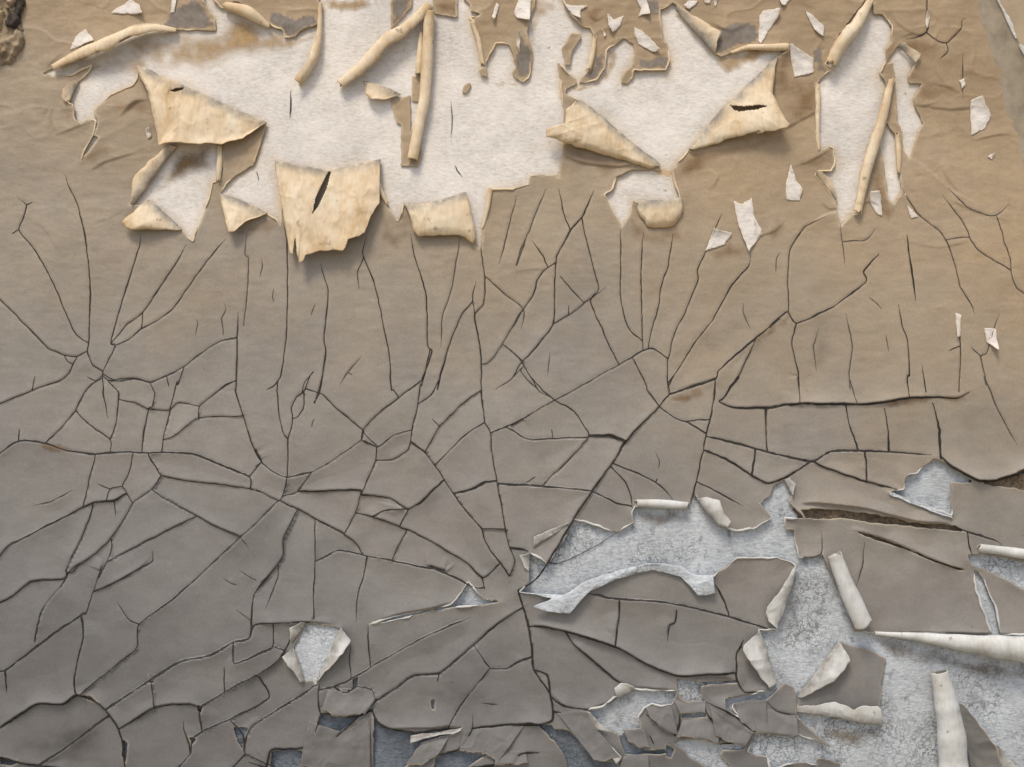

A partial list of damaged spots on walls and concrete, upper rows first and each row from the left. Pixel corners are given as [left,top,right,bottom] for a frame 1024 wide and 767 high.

peeling [44,0,923,263]
peeling [970,95,991,135]
peeling [984,328,999,350]
crack [0,175,1024,767]
peeling [889,459,972,518]
peeling [282,622,351,685]
peeling [370,581,498,625]
peeling [519,478,1024,767]